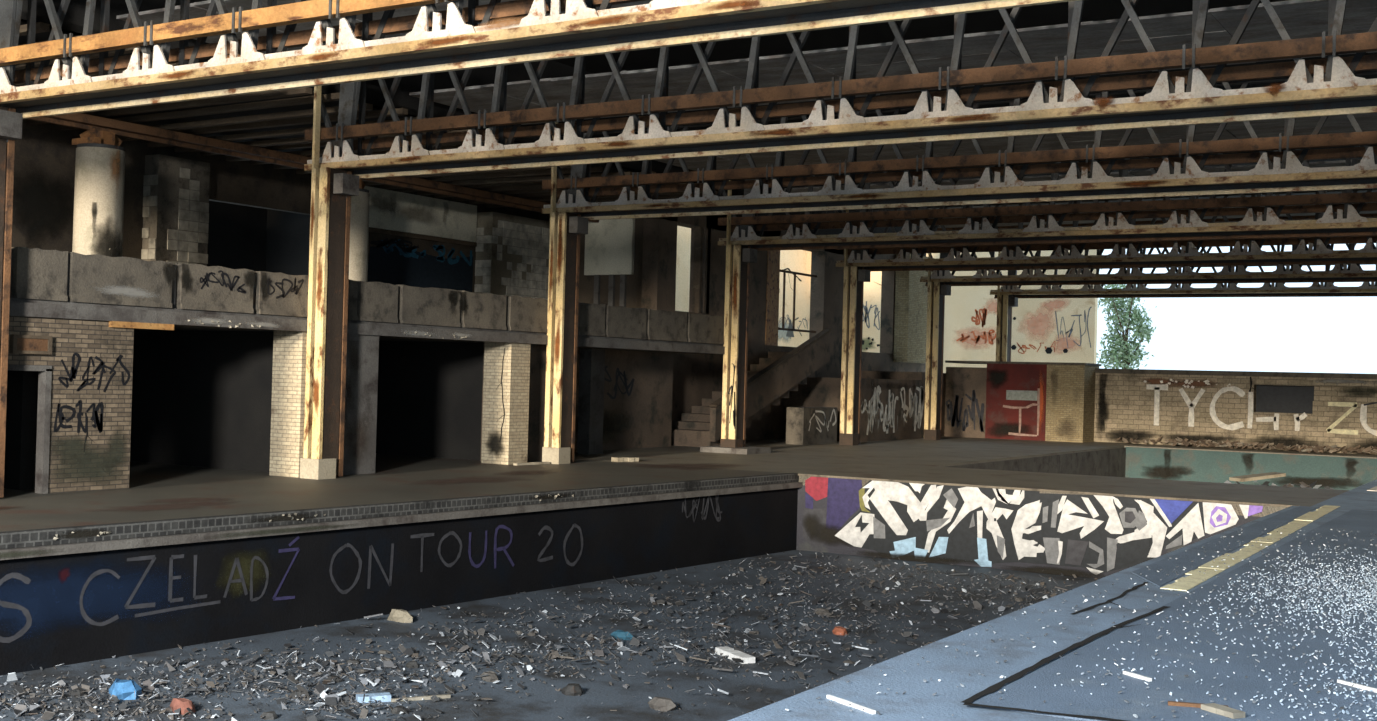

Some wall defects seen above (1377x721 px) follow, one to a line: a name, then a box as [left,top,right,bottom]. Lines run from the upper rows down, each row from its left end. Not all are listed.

corrosion [711,1,753,9]
corrosion [580,16,628,26]
corrosion [426,18,522,46]
corrosion [309,53,335,61]
corrosion [549,216,562,294]